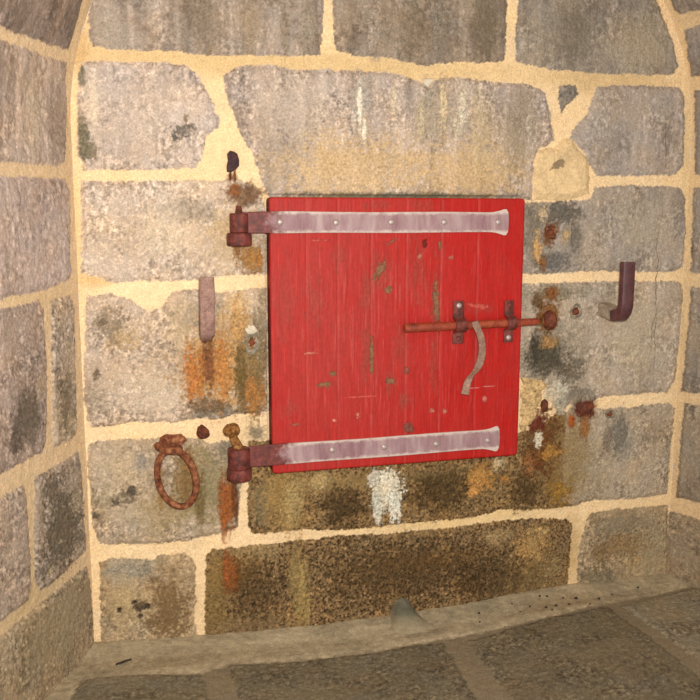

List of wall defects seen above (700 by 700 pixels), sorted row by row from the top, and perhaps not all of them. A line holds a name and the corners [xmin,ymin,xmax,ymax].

rust [228,171,266,207]
rust [234,245,263,274]
rust [534,205,569,271]
rust [531,287,559,349]
rust [173,301,267,422]
rust [523,400,596,506]
rust [217,478,239,537]
water stain [277,467,470,533]